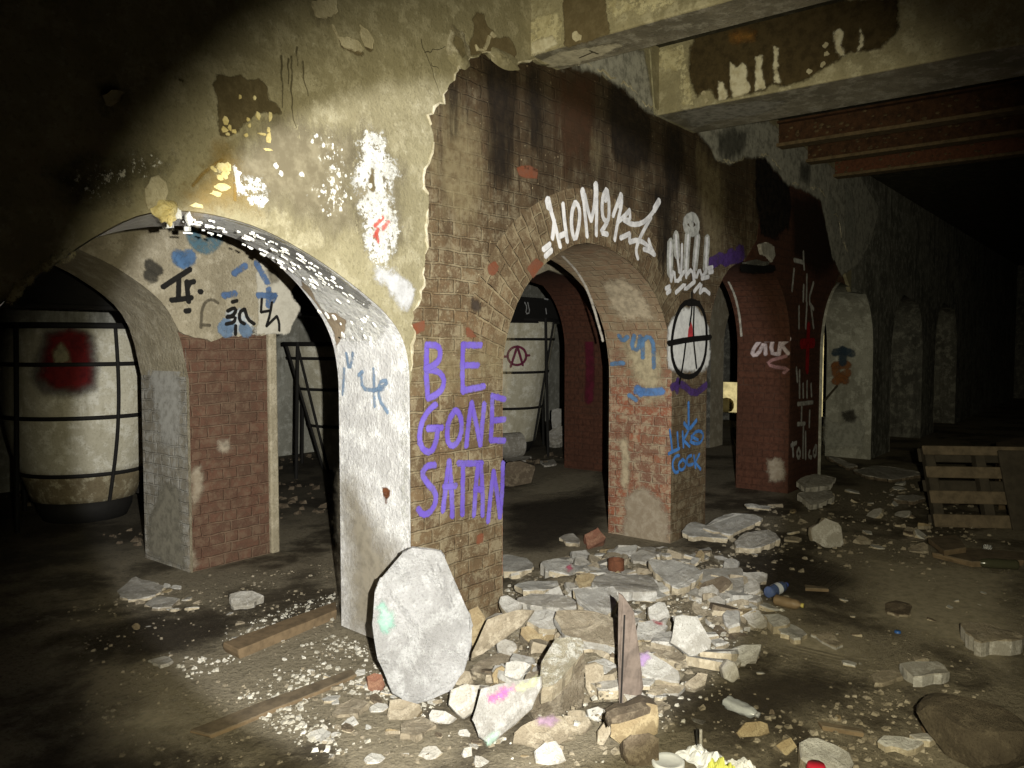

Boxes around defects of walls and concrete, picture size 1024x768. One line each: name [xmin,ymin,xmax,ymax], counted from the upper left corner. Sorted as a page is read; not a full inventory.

leakage [488,62,516,181]
leakage [608,49,655,166]
peeling [209,0,847,618]